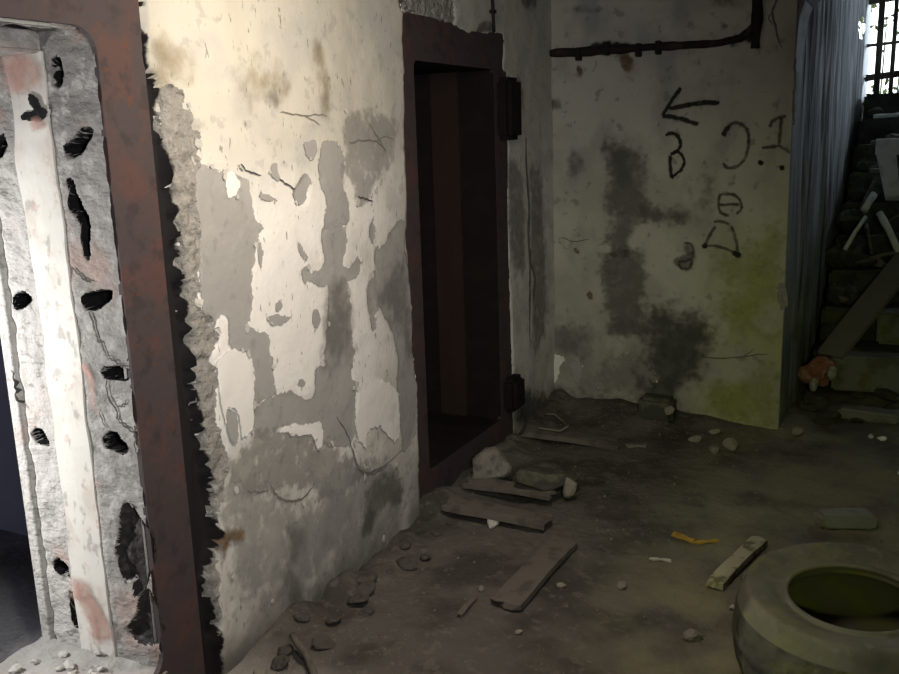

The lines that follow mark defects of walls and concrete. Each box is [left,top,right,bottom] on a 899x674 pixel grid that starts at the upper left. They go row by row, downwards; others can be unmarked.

crack [280,111,327,124]
spalling [67,177,91,260]
leakage [507,165,545,341]
leakage [602,144,709,395]
spalling [13,290,33,310]
spalling [81,289,113,311]
spalling [153,84,418,522]
crack [88,306,137,454]
crack [337,417,403,475]
crack [248,480,316,505]
corrosion [211,530,244,557]
corrosion [72,579,110,639]